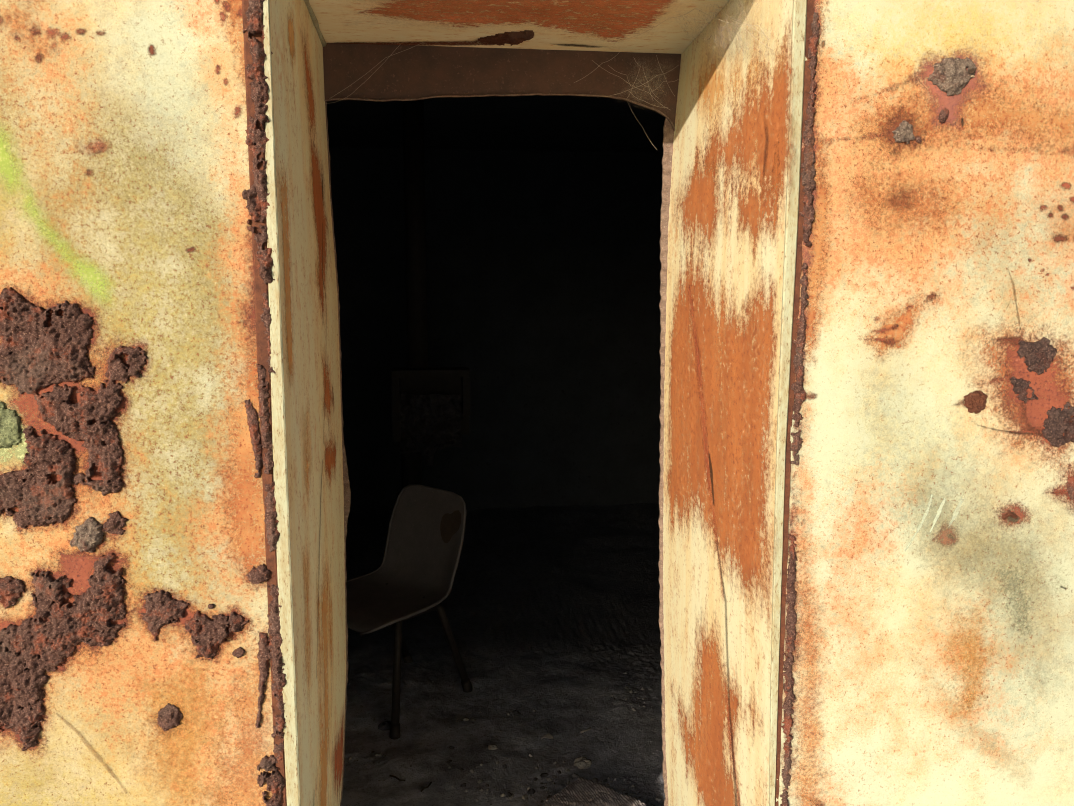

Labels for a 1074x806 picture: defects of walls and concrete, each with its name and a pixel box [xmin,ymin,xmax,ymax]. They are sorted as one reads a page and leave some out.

corrosion [361,0,671,42]
corrosion [844,50,1074,160]
corrosion [288,19,328,317]
corrosion [857,177,947,229]
corrosion [1040,182,1074,220]
corrosion [866,293,940,357]
corrosion [0,0,293,806]
corrosion [322,360,334,420]
corrosion [324,441,336,481]
corrosion [667,0,831,806]
corrosion [955,325,1074,512]
corrosion [306,565,344,806]